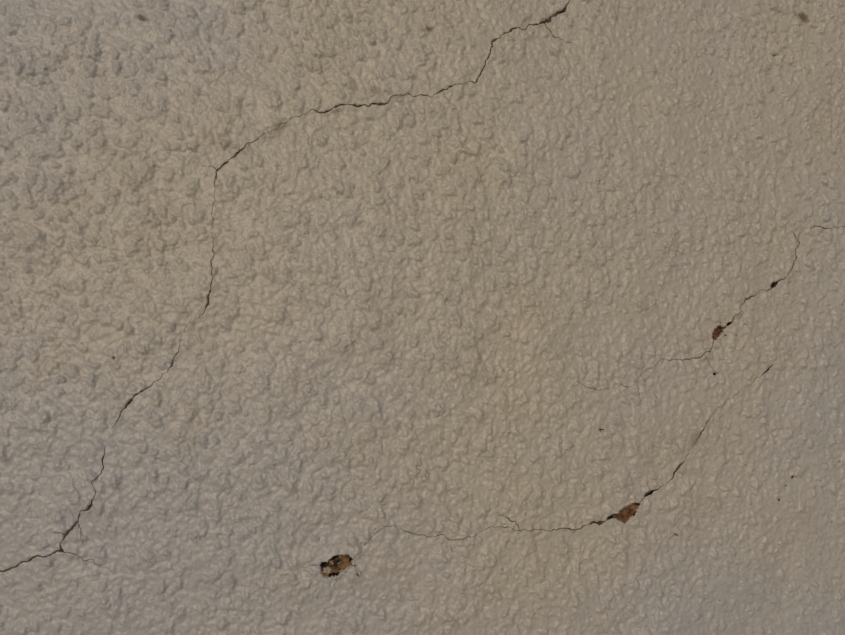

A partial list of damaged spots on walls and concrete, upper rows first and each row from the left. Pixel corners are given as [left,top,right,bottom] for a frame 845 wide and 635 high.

crack [207,0,572,225]
crack [0,245,214,572]
spalling [320,555,361,577]
crack [264,364,773,579]
spalling [616,503,640,523]
crack [575,226,843,391]